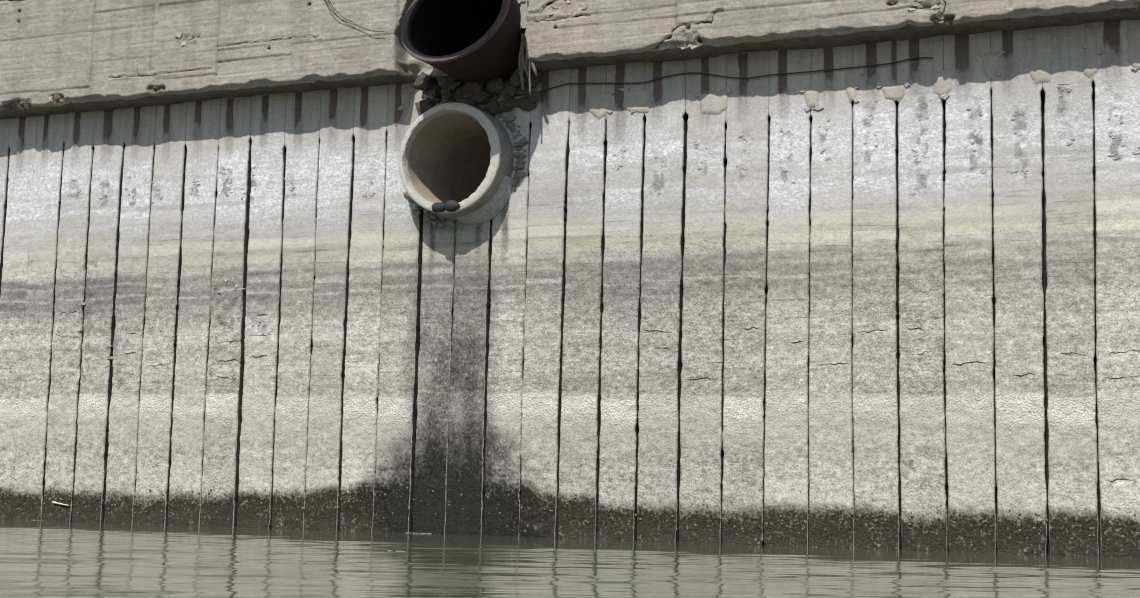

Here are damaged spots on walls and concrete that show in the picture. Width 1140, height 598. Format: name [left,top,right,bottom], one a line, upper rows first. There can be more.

crack [535,0,590,21]
crack [653,12,721,50]
leakage [0,332,1140,538]